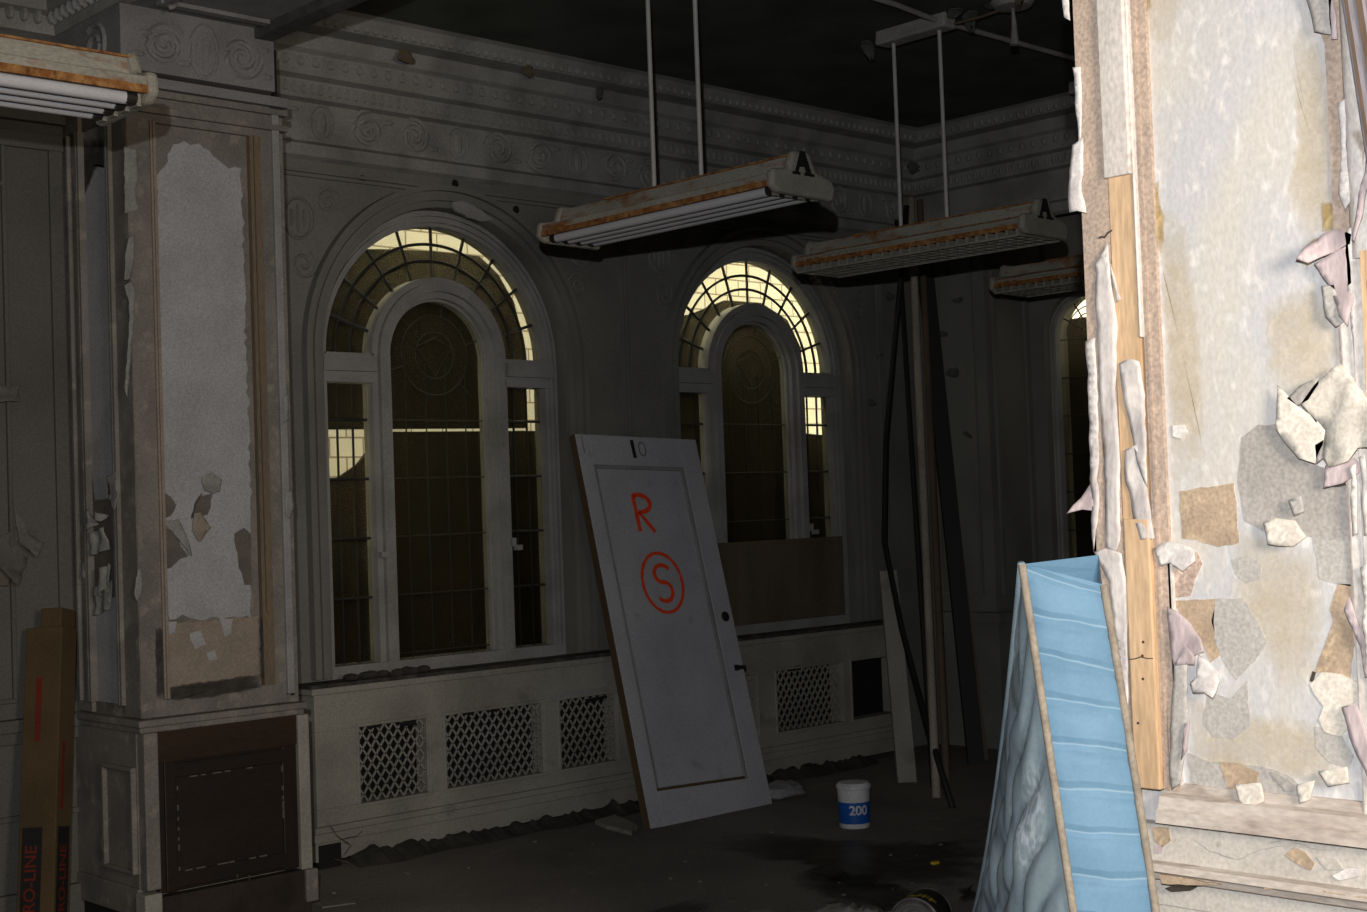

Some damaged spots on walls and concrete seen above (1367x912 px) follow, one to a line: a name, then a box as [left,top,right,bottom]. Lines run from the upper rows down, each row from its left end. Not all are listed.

peeling [1307,0,1338,39]
peeling [124,146,139,213]
peeling [1296,99,1367,352]
peeling [124,235,136,398]
flaking render [157,141,260,688]
peeling [81,475,115,616]
peeling [134,567,143,601]
peeling [1067,242,1367,805]
flaking render [1152,827,1171,854]
spalling [1159,874,1222,891]